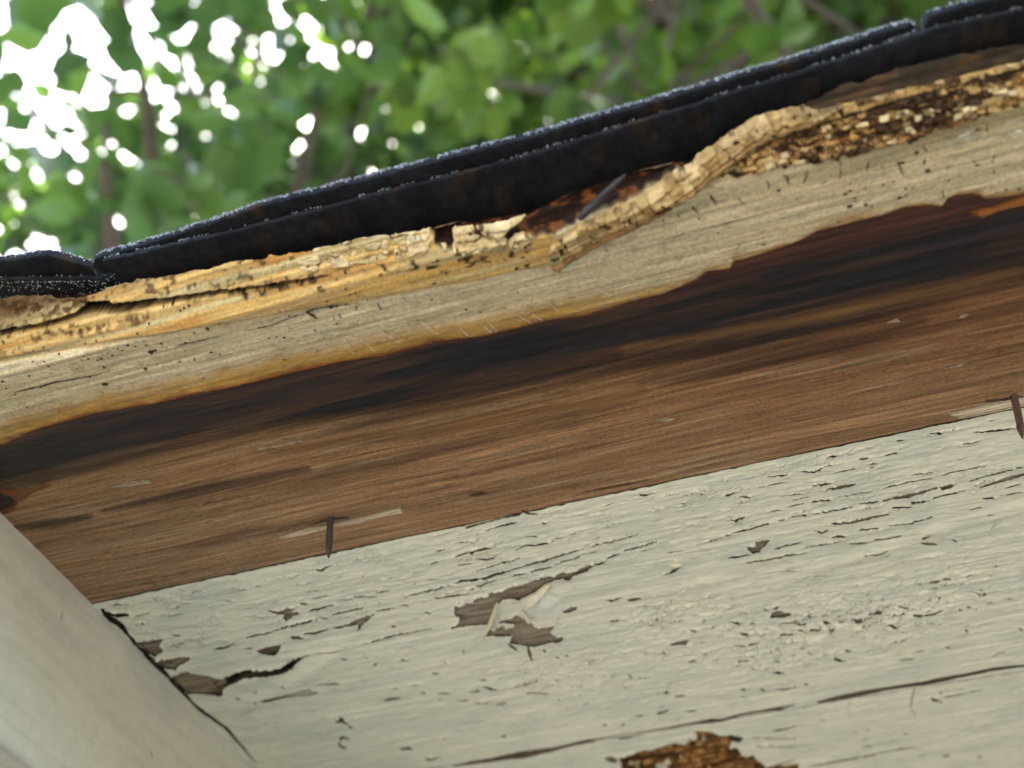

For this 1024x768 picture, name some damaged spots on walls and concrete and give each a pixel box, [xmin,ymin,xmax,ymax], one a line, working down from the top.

peeling [847,108,940,145]
peeling [953,103,978,121]
peeling [988,87,1018,96]
spalling [297,214,532,272]
damp [0,181,1024,486]
crack [736,396,1024,561]
peeling [273,608,298,619]
crack [101,511,581,762]
peeling [454,554,616,661]
crack [713,574,1008,697]
peeling [135,639,227,693]
crack [617,691,694,739]